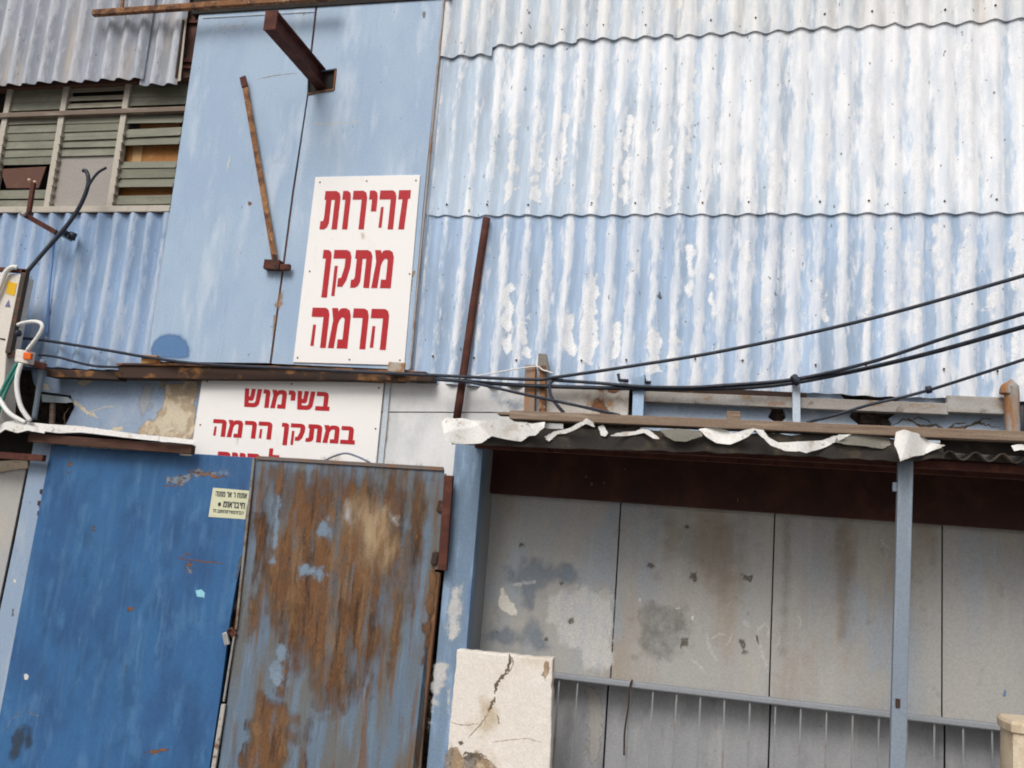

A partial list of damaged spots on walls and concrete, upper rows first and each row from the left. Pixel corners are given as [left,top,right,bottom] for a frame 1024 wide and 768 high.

peeling [496,262,625,366]
peeling [643,322,681,375]
peeling [682,243,722,322]
peeling [861,221,1024,388]
peeling [138,381,202,440]
peeling [164,468,228,487]
rust [238,464,441,768]
peeling [443,581,466,643]
crack [452,654,540,743]